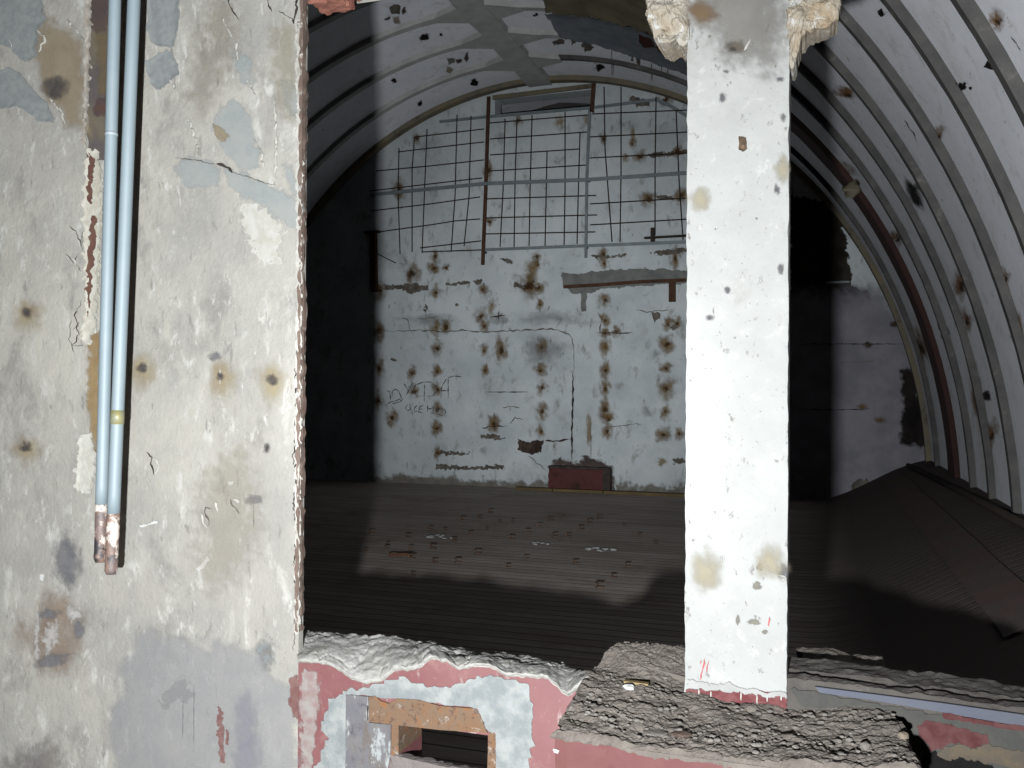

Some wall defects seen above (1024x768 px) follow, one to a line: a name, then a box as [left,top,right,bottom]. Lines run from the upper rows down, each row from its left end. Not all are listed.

peeling [0,0,66,124]
water stain [36,23,90,131]
crack [184,158,273,185]
crack [66,227,83,270]
corrosion [523,255,544,307]
crack [68,303,83,350]
peeling [213,18,305,635]
corrosion [483,340,507,374]
corrosion [563,249,687,440]
peeling [72,433,96,494]
water stain [34,600,83,667]
peeling [922,743,1024,768]